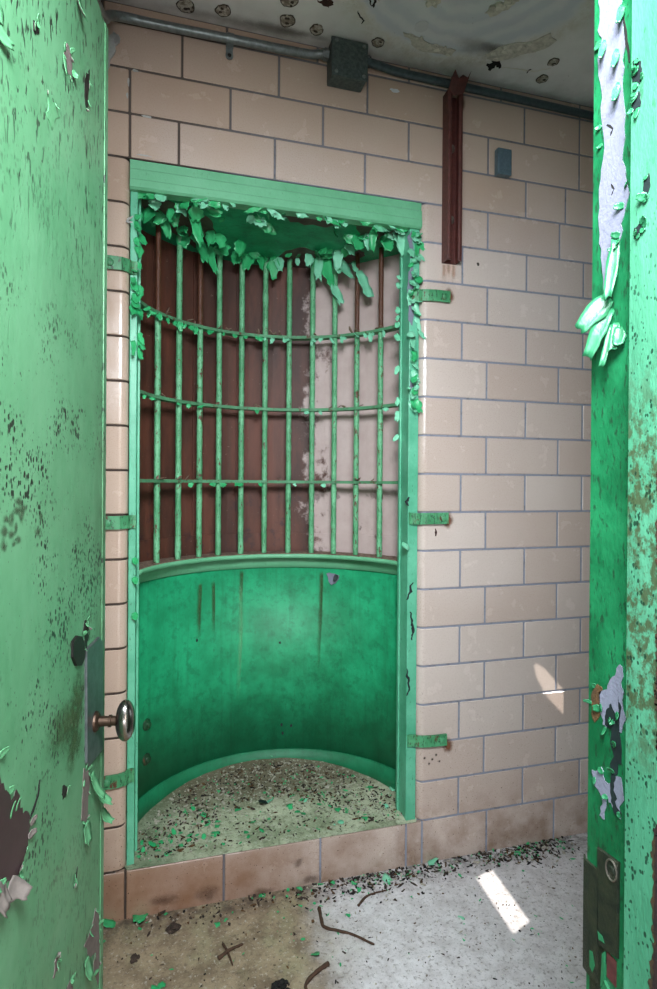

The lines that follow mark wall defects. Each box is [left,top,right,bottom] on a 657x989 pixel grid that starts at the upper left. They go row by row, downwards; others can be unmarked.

peeling [0,3,14,51]
spalling [485,33,560,84]
peeling [575,0,651,367]
water stain [2,499,25,549]
peeling [592,664,626,819]
peeling [0,778,40,919]
peeling [67,908,116,989]
rust [648,824,657,989]